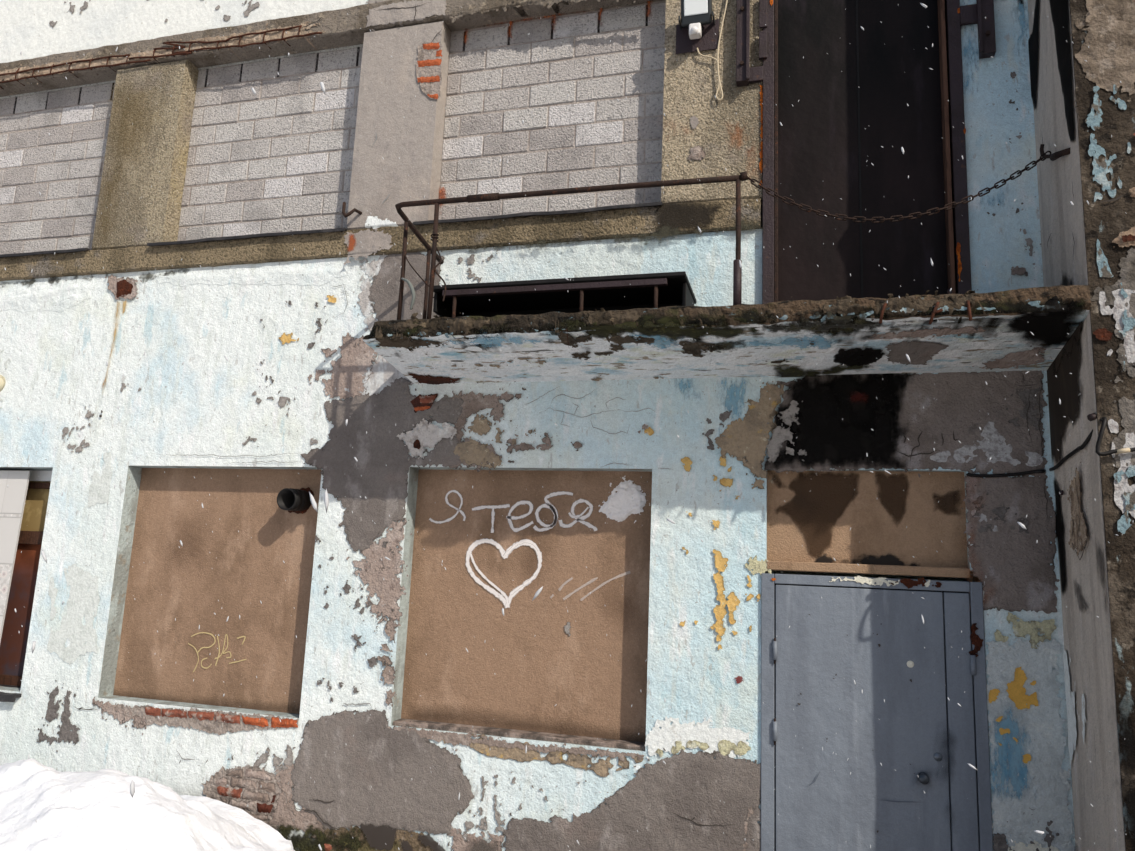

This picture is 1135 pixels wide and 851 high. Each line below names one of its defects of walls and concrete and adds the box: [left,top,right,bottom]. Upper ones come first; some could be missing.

peeling [1085,78,1131,202]
peeling [279,250,553,473]
peeling [702,380,807,499]
leakage [773,365,888,429]
leakage [773,472,919,566]
leakage [933,491,998,532]
leakage [930,421,1043,467]
peeling [1108,396,1135,534]
corrosion [969,623,983,657]
peeling [34,680,80,752]
peeling [92,697,751,851]
peeling [985,612,1086,851]